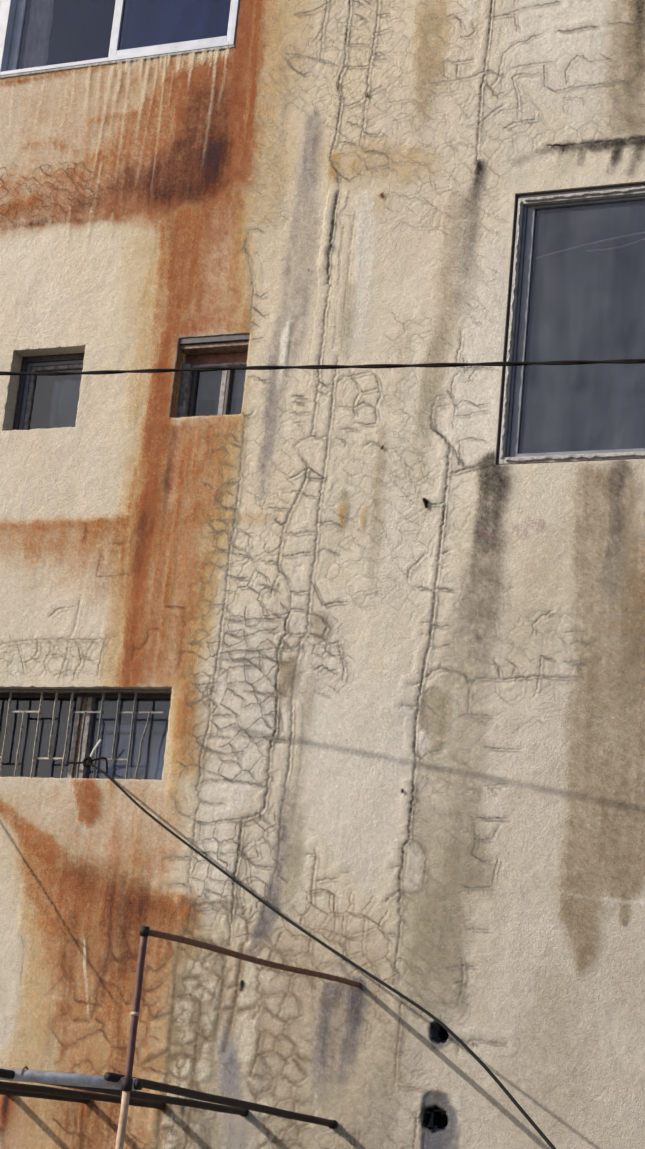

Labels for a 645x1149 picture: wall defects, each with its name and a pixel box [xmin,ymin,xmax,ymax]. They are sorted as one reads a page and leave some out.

crack [426,0,645,159]
water stain [564,0,645,166]
rust [0,0,275,775]
crack [15,604,107,676]
crack [51,0,389,1149]
crack [298,334,587,1021]
water stain [473,454,508,575]
water stain [559,459,645,971]
rust [73,778,101,824]
rust [0,801,196,1077]
rust [0,1081,145,1149]
crack [395,997,426,1090]